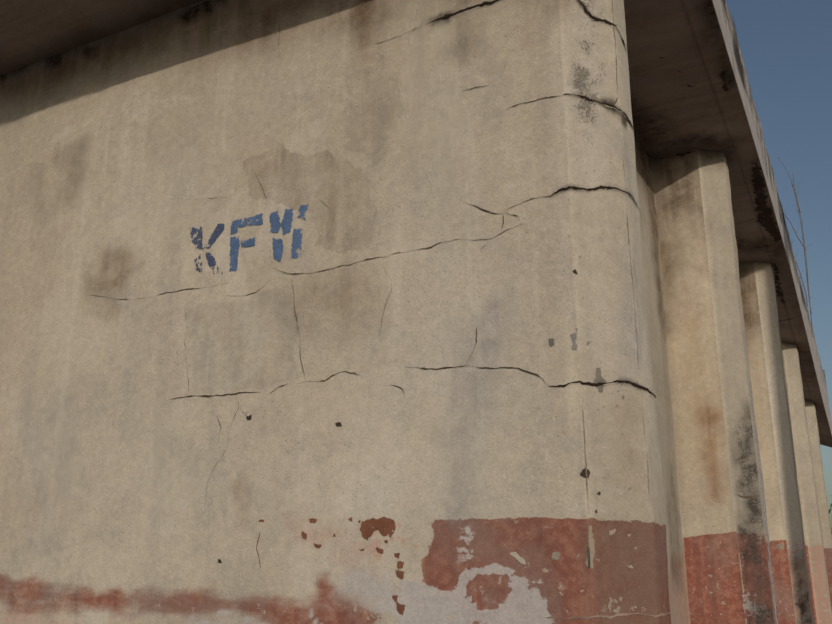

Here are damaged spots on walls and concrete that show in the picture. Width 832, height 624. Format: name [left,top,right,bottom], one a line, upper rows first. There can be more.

damp [728,21,745,88]
crack [173,0,695,514]
damp [736,388,770,566]
peeling [348,517,396,554]
peeling [394,553,404,579]
peeling [577,525,595,569]